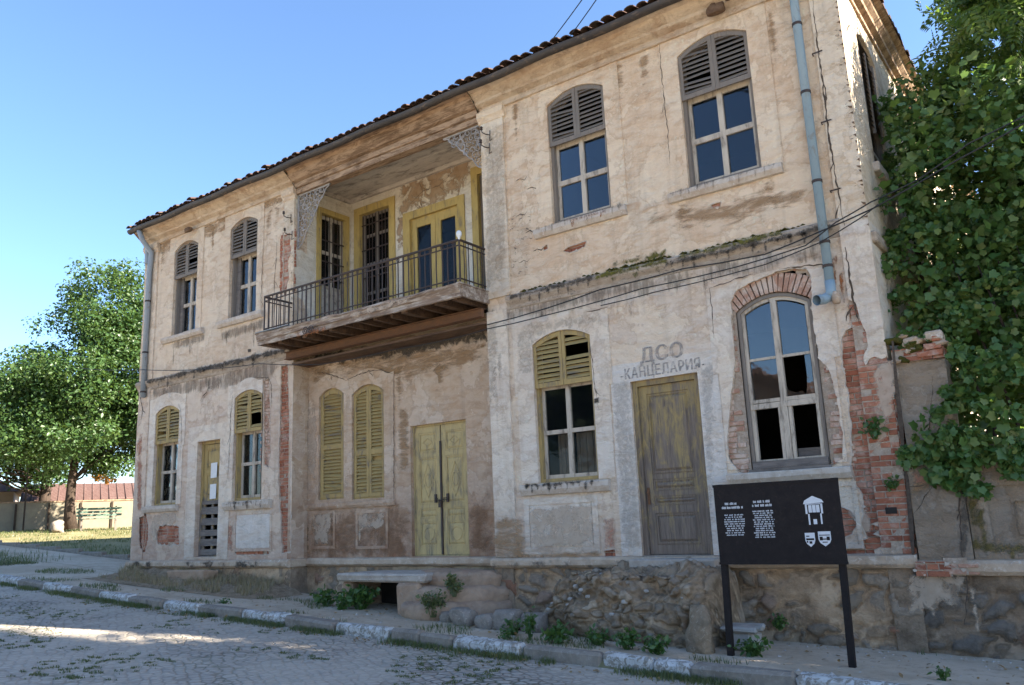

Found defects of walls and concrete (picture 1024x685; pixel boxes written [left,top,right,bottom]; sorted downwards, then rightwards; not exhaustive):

flaking render [279,220,297,299]
water stain [677,188,802,221]
crack [784,3,859,321]
flaking render [139,513,180,553]
flaking render [235,365,292,556]
peeling [313,513,331,543]
flaking render [728,268,812,473]
flaking render [815,301,980,577]